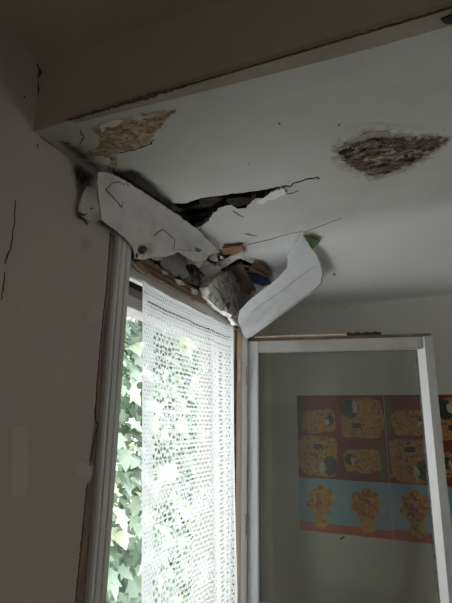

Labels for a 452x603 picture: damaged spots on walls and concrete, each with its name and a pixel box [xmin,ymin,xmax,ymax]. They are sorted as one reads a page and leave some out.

peeling [81,106,181,173]
spalling [324,122,452,184]
peeling [199,187,286,208]
crack [278,176,320,194]
crack [1,200,16,300]
peeling [206,294,239,326]